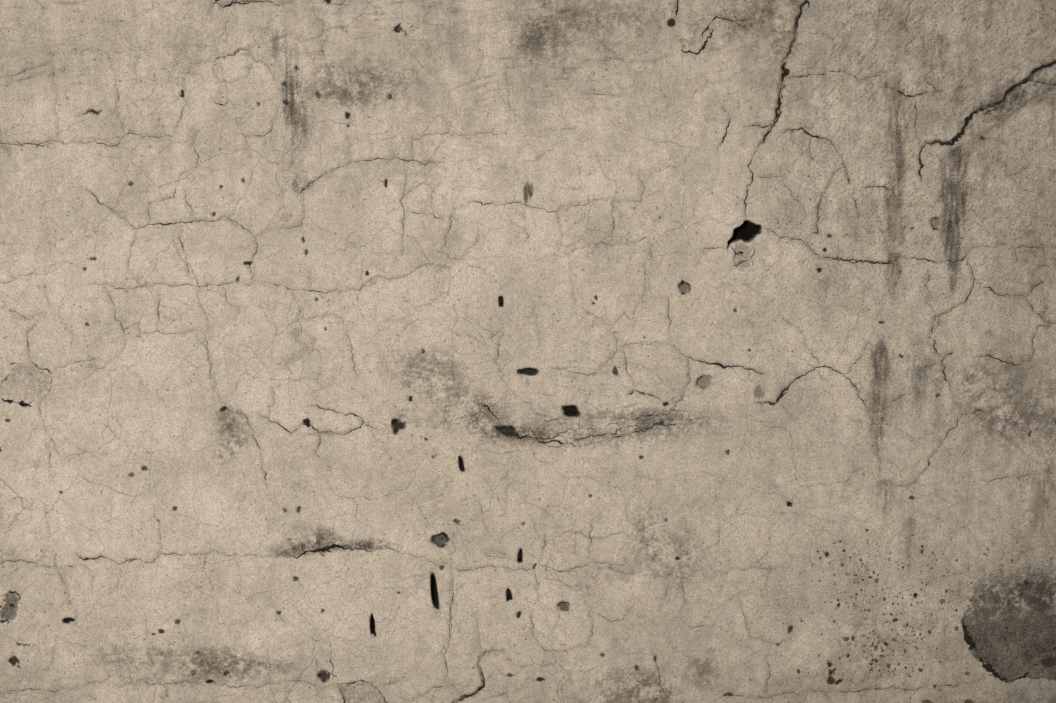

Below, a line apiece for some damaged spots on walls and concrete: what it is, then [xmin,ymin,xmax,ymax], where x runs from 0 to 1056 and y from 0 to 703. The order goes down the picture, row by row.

crack [214,0,293,8]
crack [92,132,457,334]
crack [473,201,588,238]
crack [720,0,1056,381]
crack [602,219,761,400]
crack [227,405,373,447]
crack [757,353,896,413]
crack [433,562,505,703]
crack [520,525,610,584]
mould [817,540,935,690]